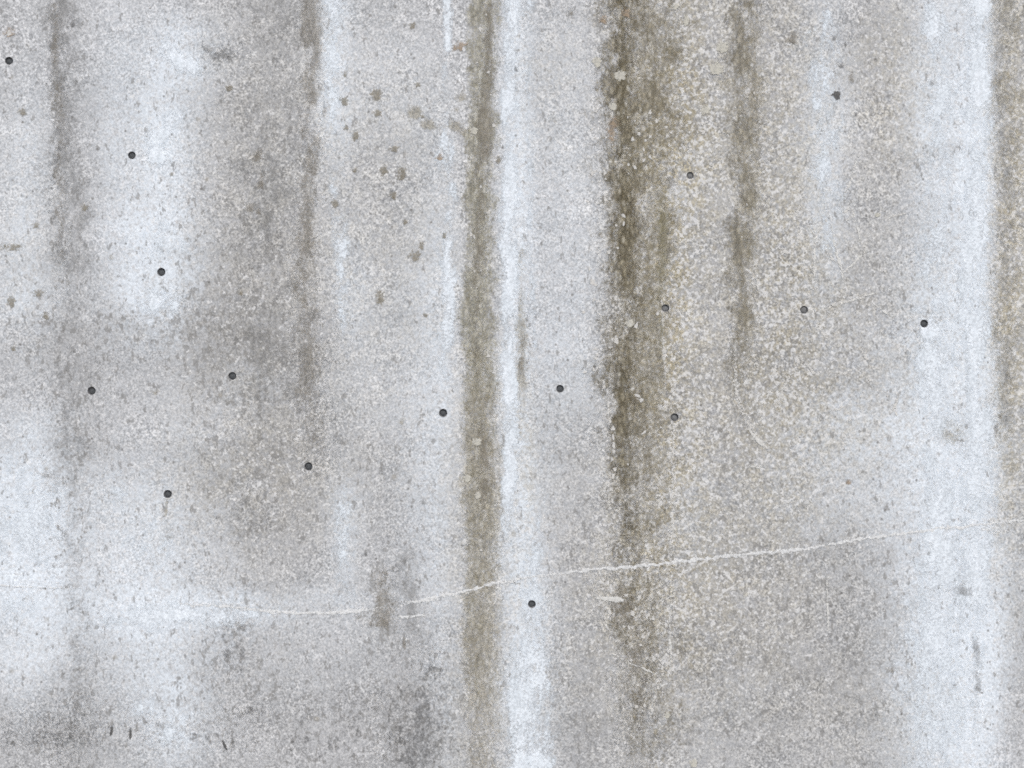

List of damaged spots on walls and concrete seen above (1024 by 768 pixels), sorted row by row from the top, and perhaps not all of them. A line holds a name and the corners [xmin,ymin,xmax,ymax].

water stain [490,0,534,127]
water stain [486,138,535,545]
water stain [592,0,670,491]
water stain [506,547,555,768]
crack [181,519,1023,619]